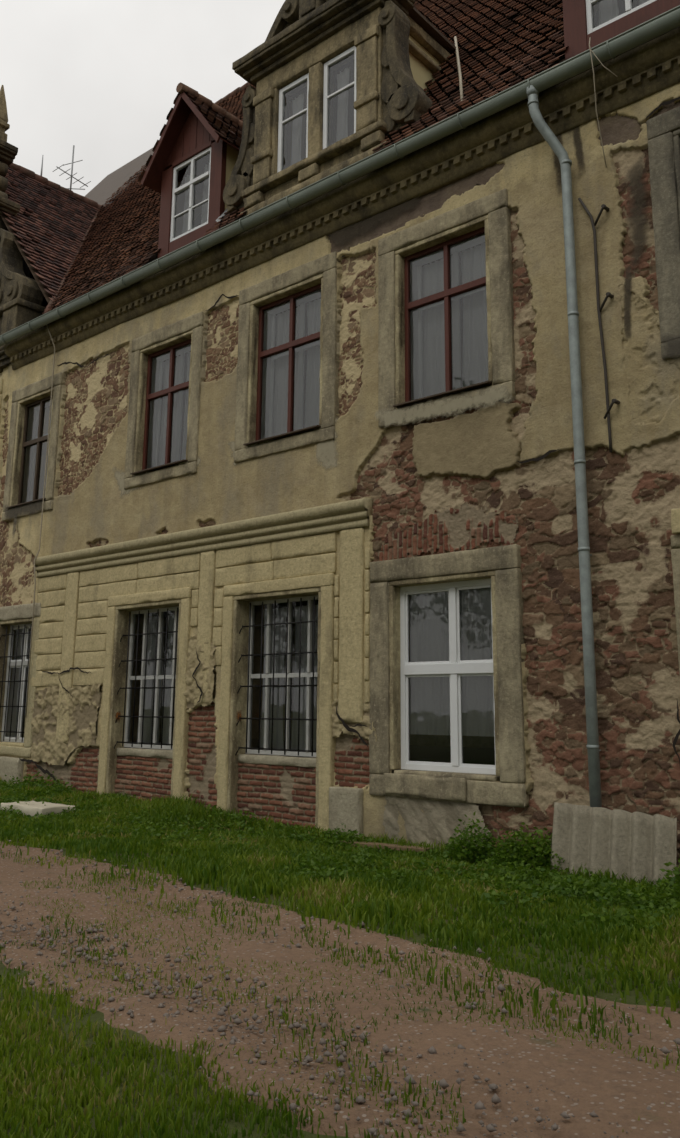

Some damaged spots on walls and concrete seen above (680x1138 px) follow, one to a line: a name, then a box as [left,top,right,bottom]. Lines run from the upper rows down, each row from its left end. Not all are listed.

flaking render [0,398,36,607]
flaking render [58,344,130,496]
flaking render [204,299,239,382]
flaking render [328,163,505,418]
flaking render [340,209,680,876]
flaking render [597,100,680,427]
flaking render [331,699,377,788]